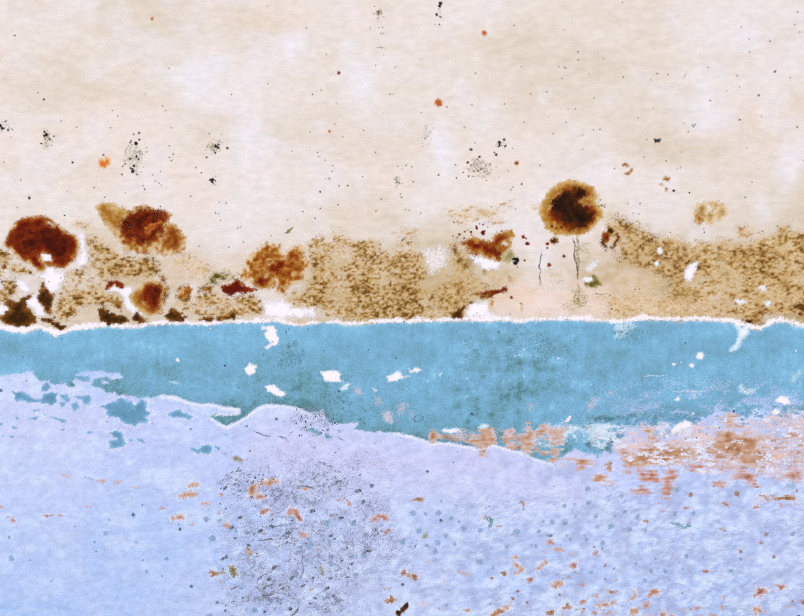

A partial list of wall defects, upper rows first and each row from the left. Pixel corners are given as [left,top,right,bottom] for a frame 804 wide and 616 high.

leakage [0,248,47,304]
rust [0,214,81,331]
rust [94,201,188,257]
leakage [51,217,265,322]
rust [97,241,311,327]
leakage [285,199,540,325]
rust [538,179,623,252]
leakage [563,208,804,344]
peeling [0,382,326,453]
peeling [386,367,421,382]
peeling [320,370,804,534]
peeling [244,476,285,520]